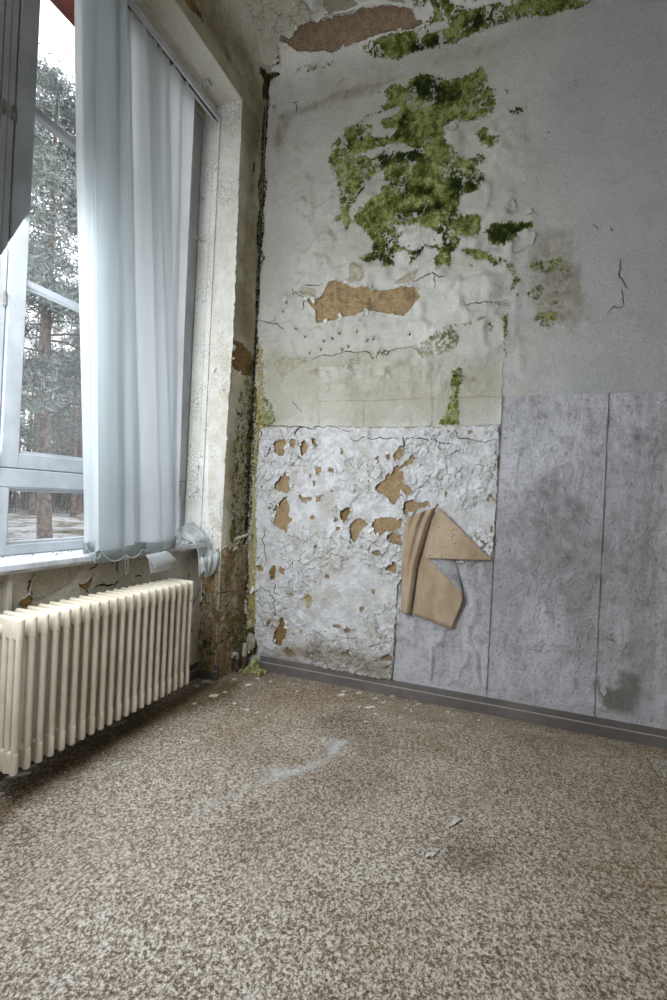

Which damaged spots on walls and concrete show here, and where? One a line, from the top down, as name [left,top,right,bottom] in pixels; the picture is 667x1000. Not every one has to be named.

flaking render [246,0,435,66]
peeling [208,103,254,532]
damp [229,95,271,634]
flaking render [273,261,423,393]
crack [607,259,627,314]
spalling [197,422,499,680]
damp [599,673,638,711]